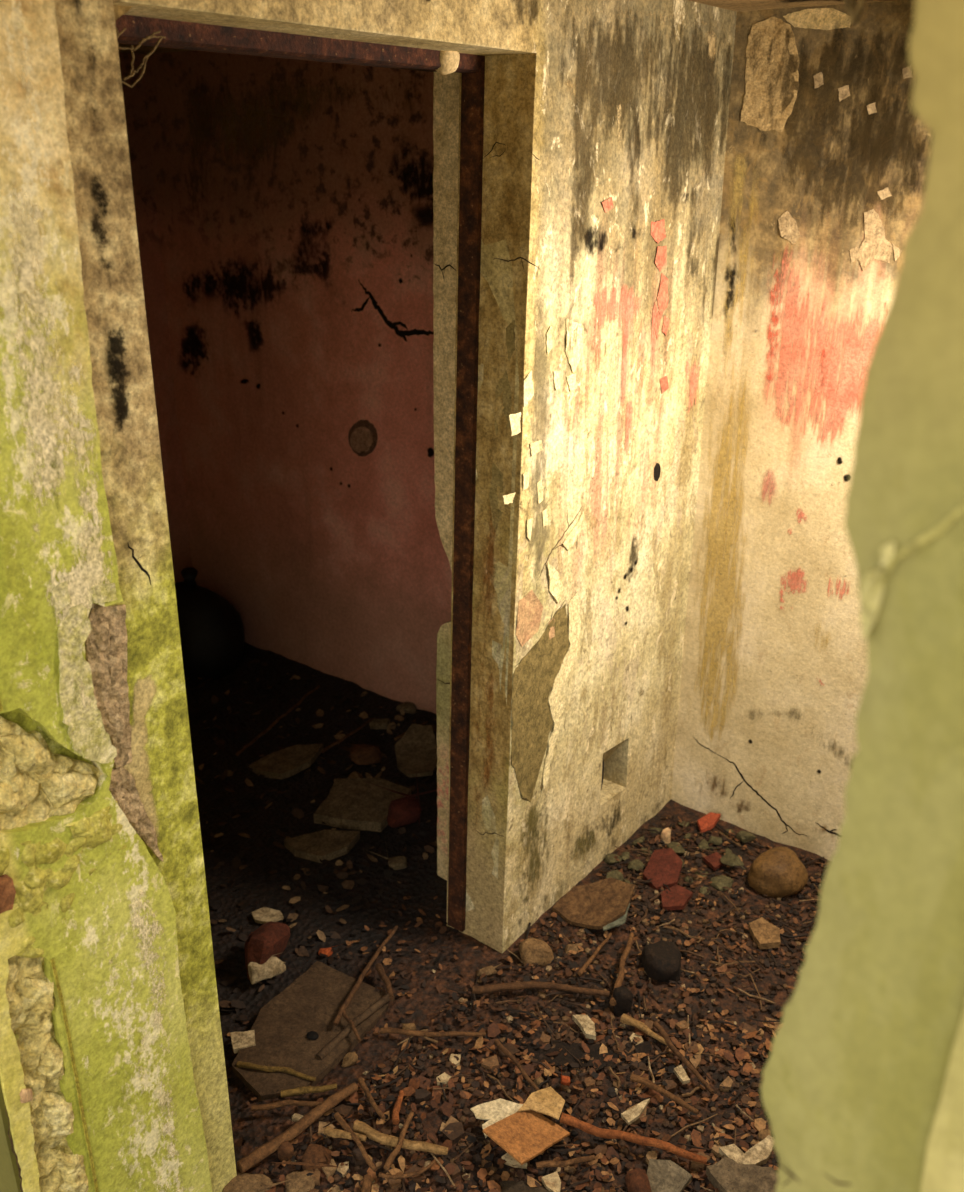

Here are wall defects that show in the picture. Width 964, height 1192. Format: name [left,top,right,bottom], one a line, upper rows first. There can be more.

water stain [562,11,731,258]
flaking render [741,8,850,132]
spalling [0,191,164,862]
water stain [107,329,130,432]
crack [352,279,434,342]
water stain [529,306,550,575]
water stain [703,161,754,338]
peeling [850,187,902,271]
crack [865,504,964,604]
flaking render [511,562,581,803]
crack [694,738,839,836]
spalling [5,955,89,1192]